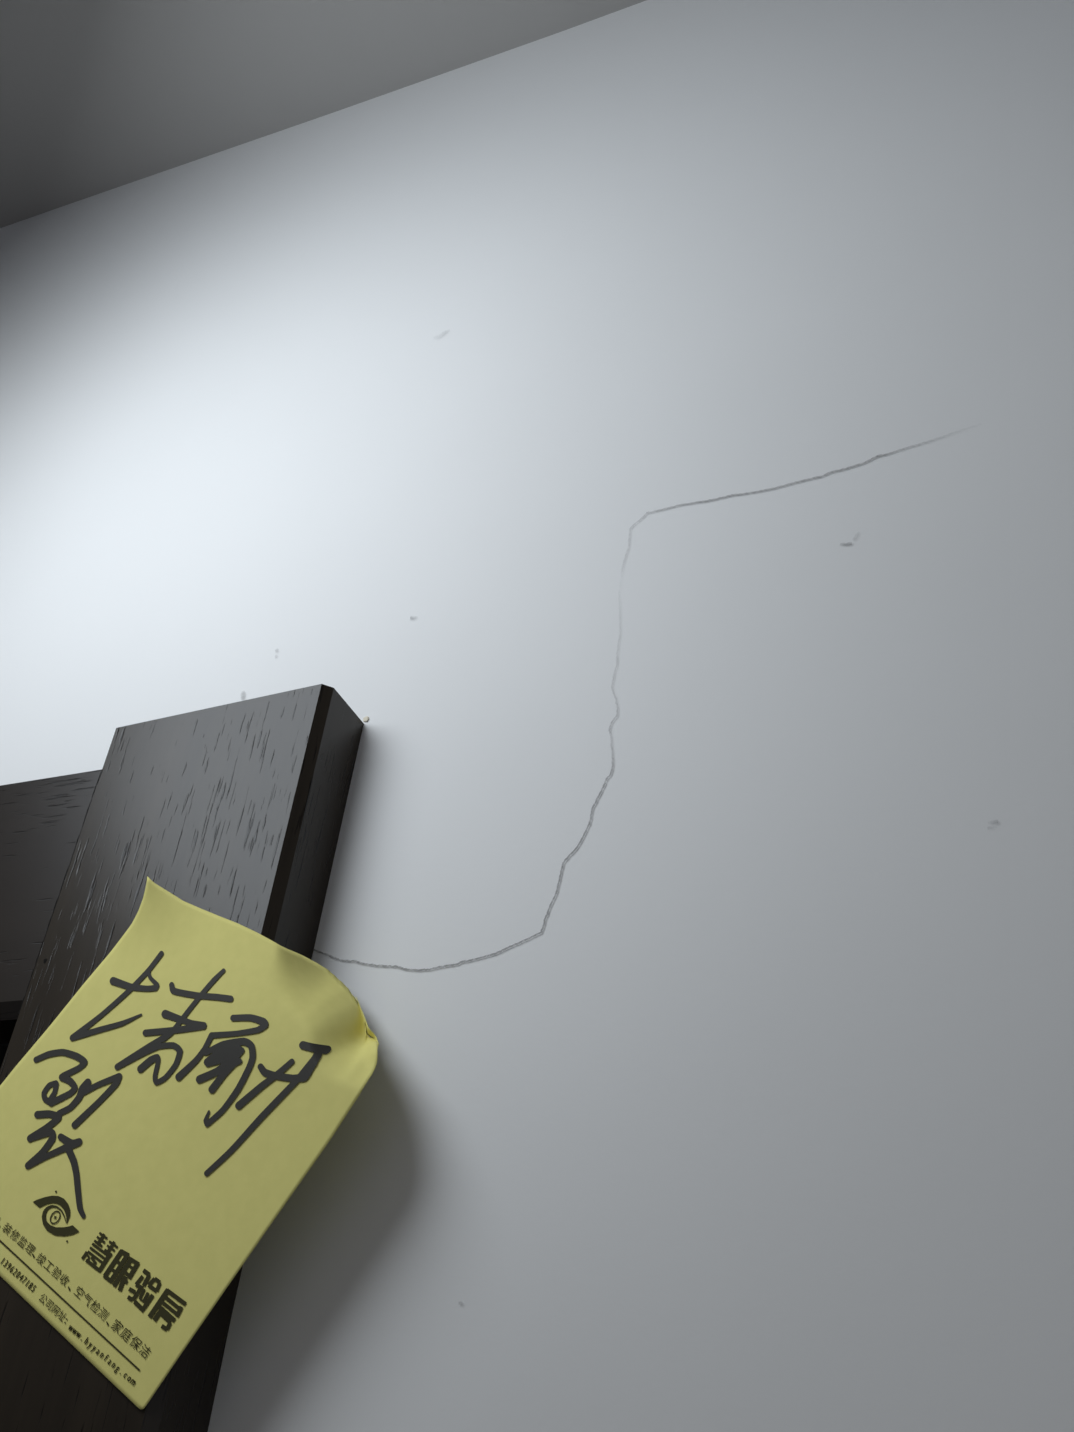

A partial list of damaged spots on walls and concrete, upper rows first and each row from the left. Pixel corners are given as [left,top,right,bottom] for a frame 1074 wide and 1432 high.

crack [313,766,613,971]